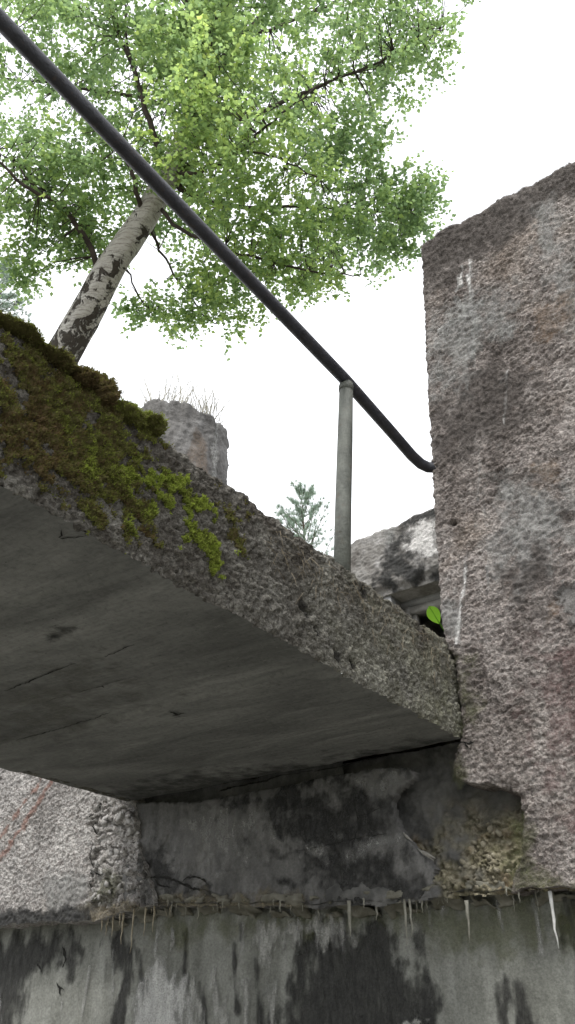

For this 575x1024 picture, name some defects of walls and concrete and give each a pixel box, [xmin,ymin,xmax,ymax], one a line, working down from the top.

water stain [0,761,517,1024]
spalling [325,742,575,907]
water stain [496,976,533,1024]
water stain [535,890,575,949]